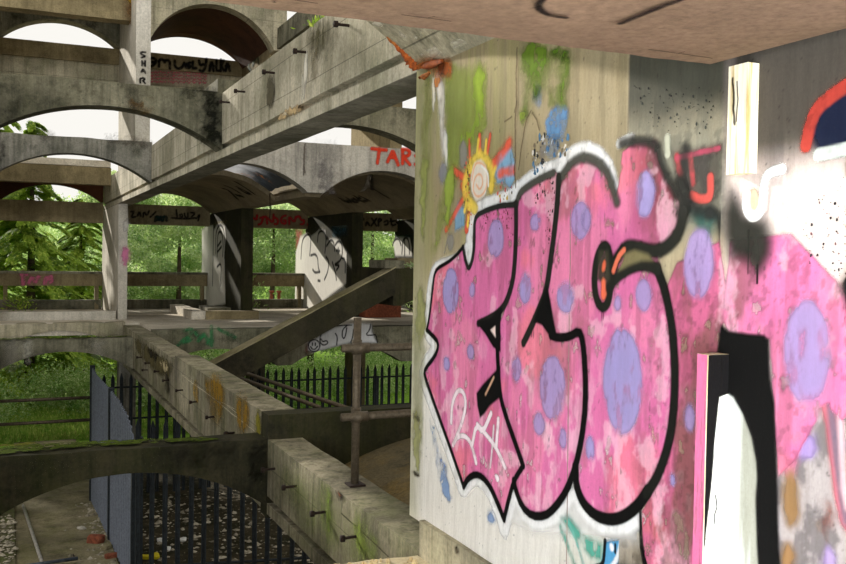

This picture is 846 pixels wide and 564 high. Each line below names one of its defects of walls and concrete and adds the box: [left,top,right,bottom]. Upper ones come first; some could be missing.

rust [387,37,451,87]
leakage [200,88,224,148]